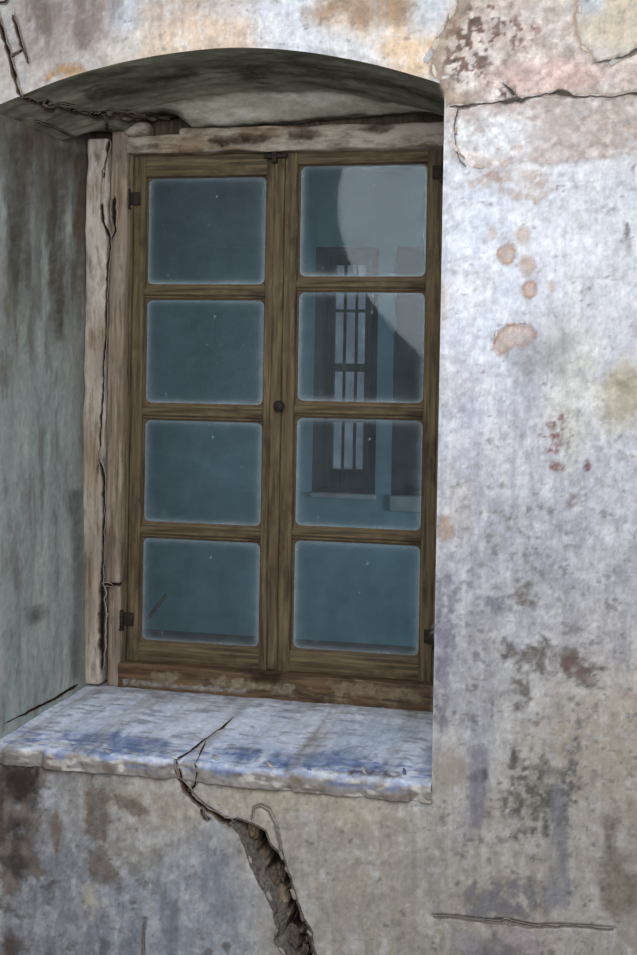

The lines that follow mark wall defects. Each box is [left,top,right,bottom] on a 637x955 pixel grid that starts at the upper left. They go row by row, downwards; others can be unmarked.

flaking render [424,0,637,169]
crack [450,83,637,167]
crack [595,48,637,63]
crack [0,0,152,670]
crack [5,684,78,723]
leakage [0,765,55,922]
crack [173,717,317,955]
crack [433,916,614,930]